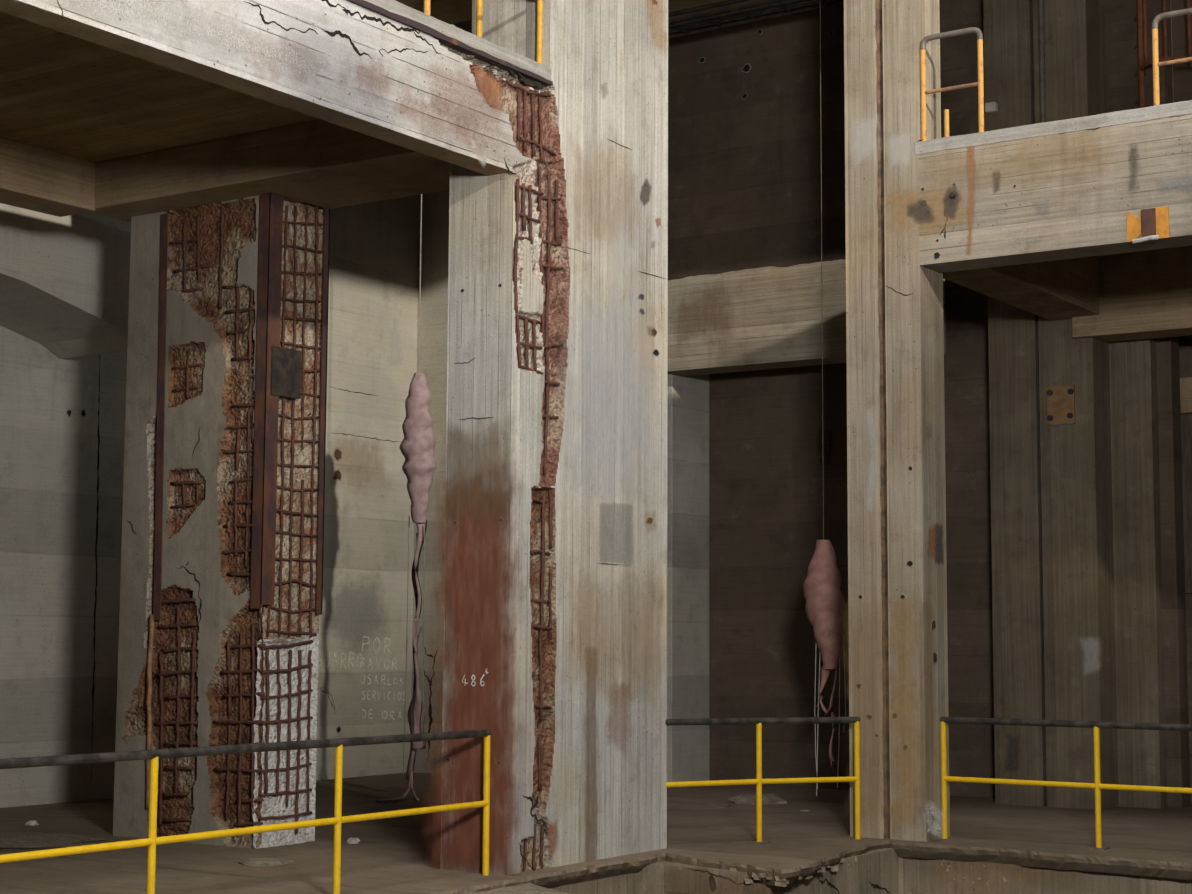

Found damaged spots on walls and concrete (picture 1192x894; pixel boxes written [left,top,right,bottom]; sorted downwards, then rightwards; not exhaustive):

crack [243,0,440,59]
spalling [440,43,570,873]
spalling [122,198,344,867]
crack [424,647,437,760]
rust [432,477,515,876]
crack [677,868,745,885]
crack [818,878,839,894]